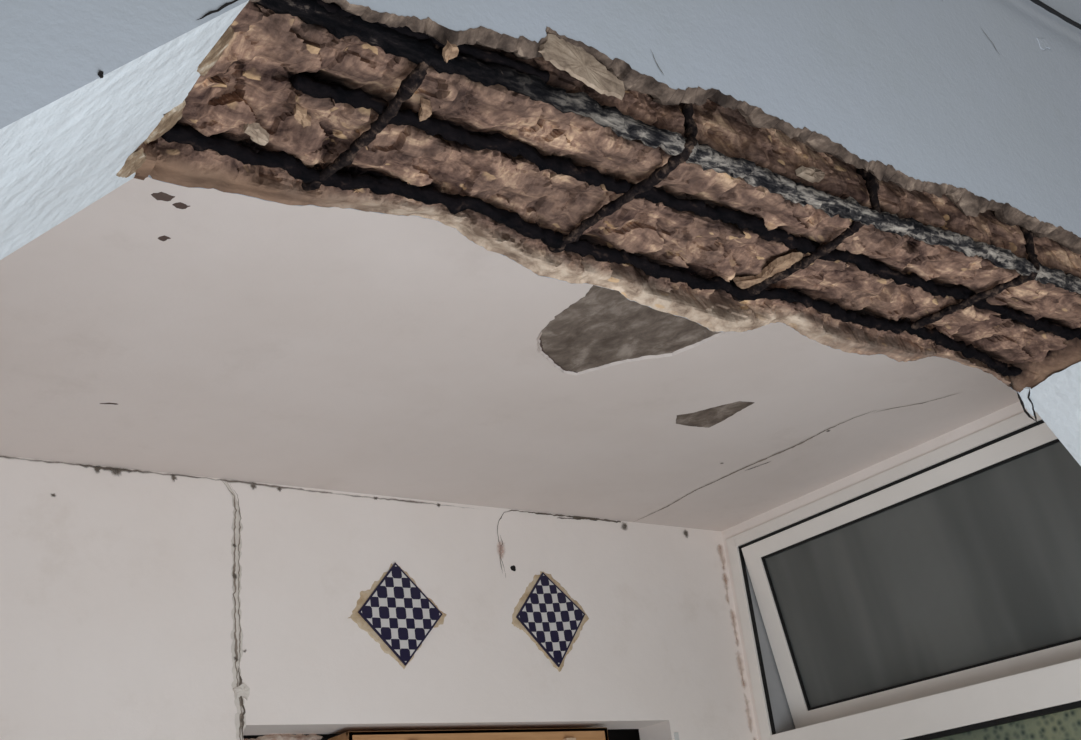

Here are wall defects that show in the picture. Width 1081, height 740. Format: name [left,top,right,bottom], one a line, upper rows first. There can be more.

spalling [116,0,1081,393]
peeling [676,401,754,428]
crack [0,456,449,740]